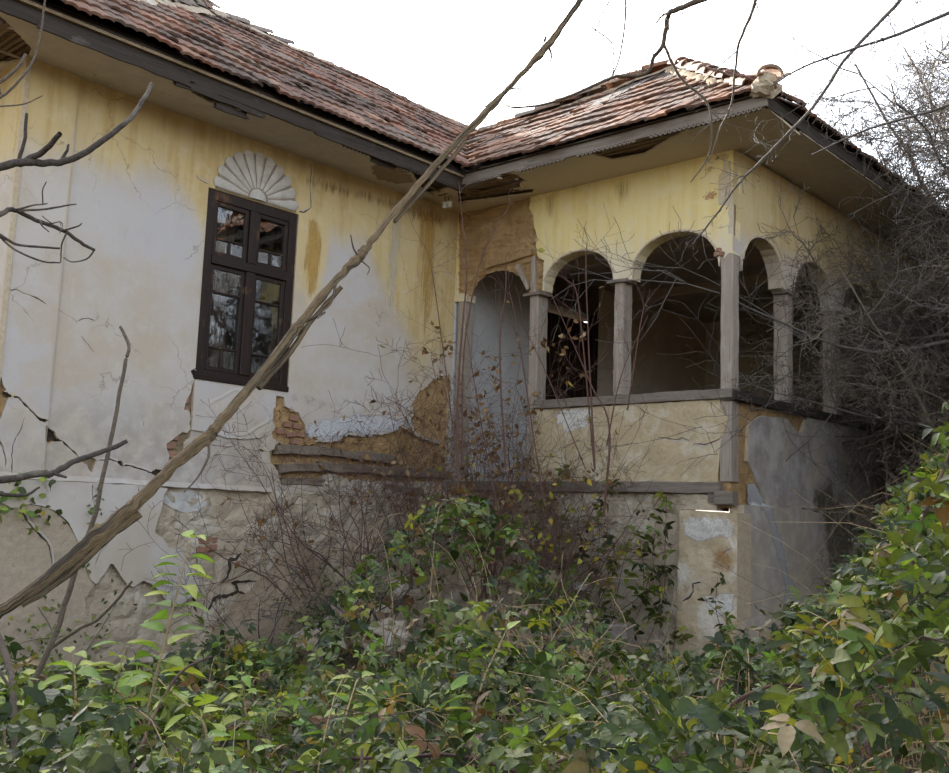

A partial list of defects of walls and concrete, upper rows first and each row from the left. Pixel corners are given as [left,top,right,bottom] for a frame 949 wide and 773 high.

flaking render [421,174,546,296]
flaking render [0,381,15,416]
crack [2,390,48,473]
damp [306,414,408,441]
crack [63,440,152,492]
flaking render [85,375,449,666]
crack [174,553,257,612]